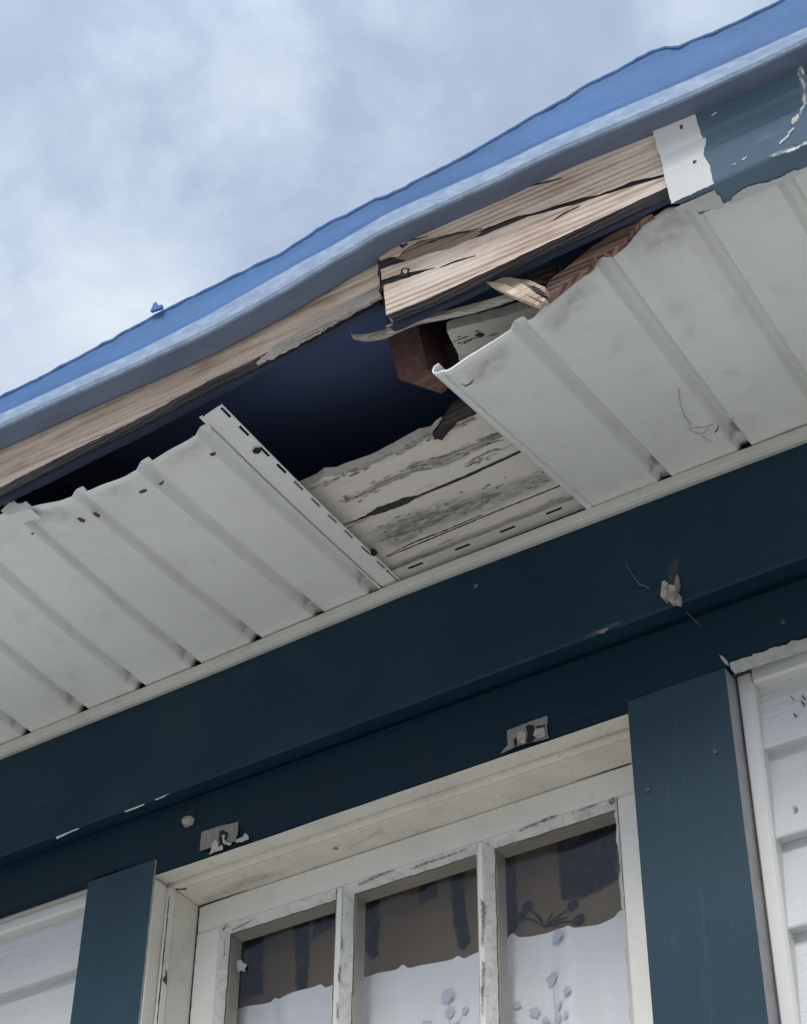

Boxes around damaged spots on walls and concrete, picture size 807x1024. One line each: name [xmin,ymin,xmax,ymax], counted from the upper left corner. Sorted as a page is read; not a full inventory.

peeling [772,67,807,156]
peeling [653,114,806,212]
crack [378,175,664,290]
peeling [322,432,503,503]
peeling [501,716,549,753]
peeling [200,822,249,855]